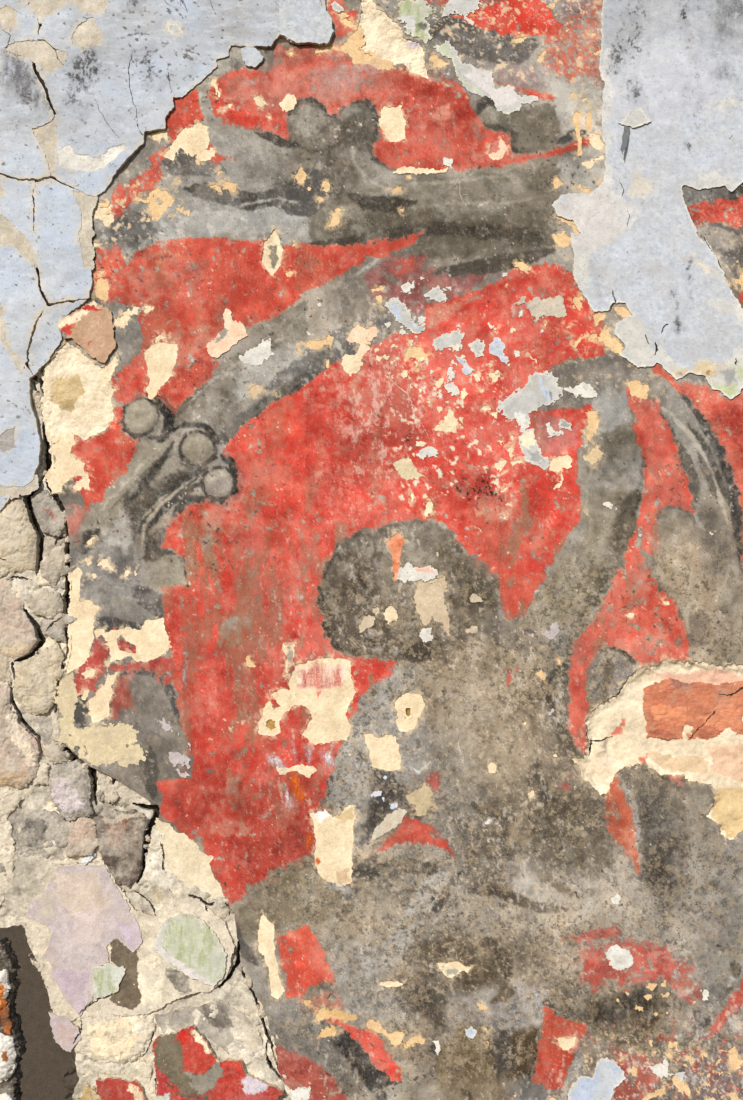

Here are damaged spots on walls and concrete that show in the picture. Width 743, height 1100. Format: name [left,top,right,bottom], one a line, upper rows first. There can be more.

crack [4,24,64,115]
crack [93,55,143,138]
crack [0,174,71,212]
crack [27,267,88,390]
flaking render [0,188,190,500]
peeling [297,276,603,489]
crack [0,428,70,738]
flaking render [257,643,356,745]
flaking render [364,692,433,840]
flaking render [571,659,743,840]
flaking render [155,818,224,900]
flaking render [309,804,355,887]